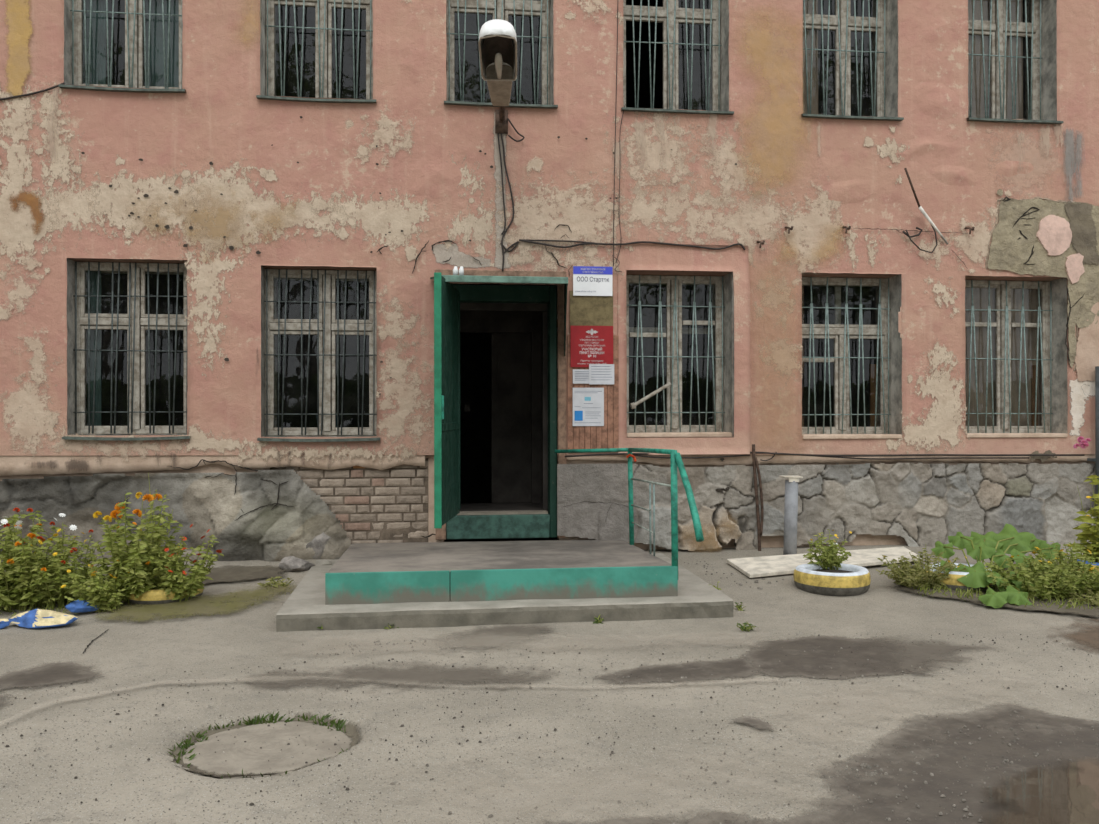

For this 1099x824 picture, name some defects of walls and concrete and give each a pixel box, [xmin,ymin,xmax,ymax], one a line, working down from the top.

flaking render [0,285,434,544]
peeling [0,75,436,376]
crack [170,459,293,520]
peeling [431,111,884,379]
peeling [886,341,970,454]
flaking render [908,189,1099,437]